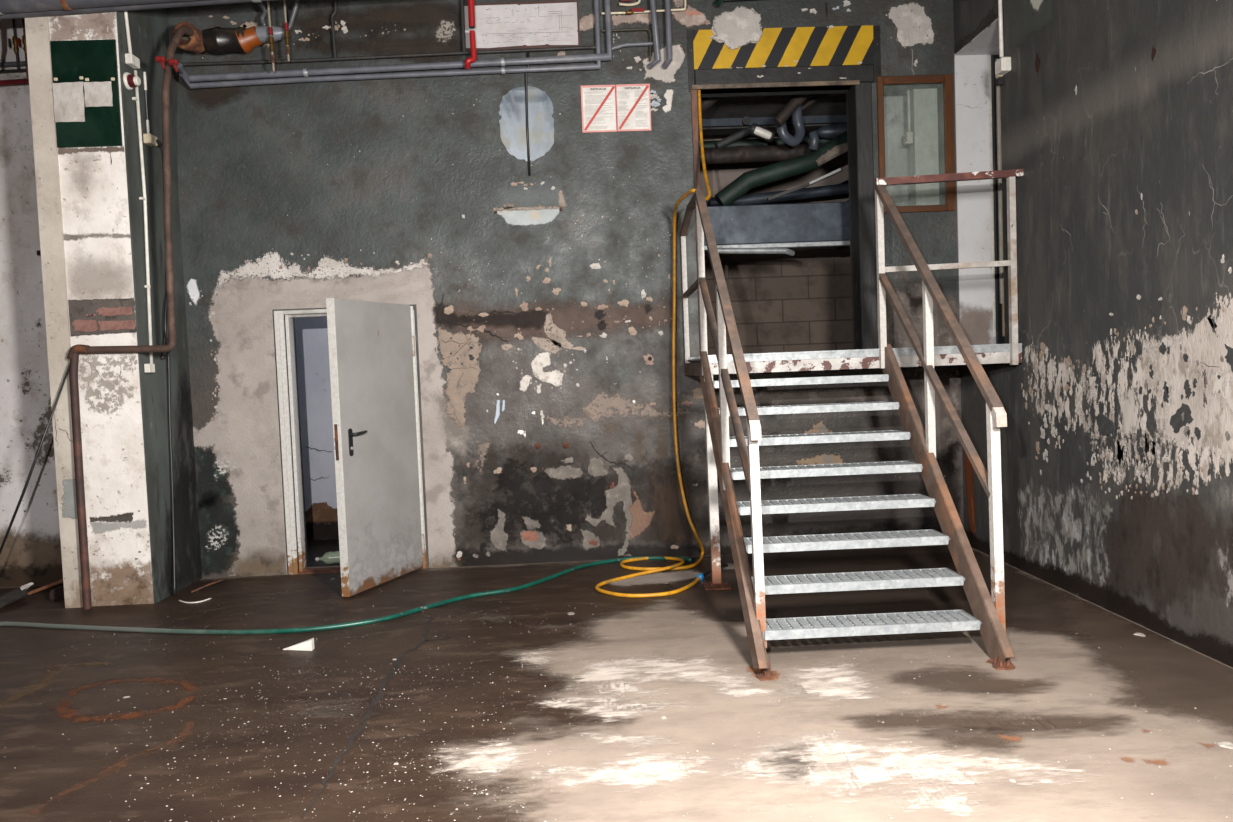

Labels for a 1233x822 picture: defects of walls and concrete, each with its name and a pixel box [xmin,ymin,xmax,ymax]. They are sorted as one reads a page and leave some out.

water stain [877,273,993,348]
flaking render [186,239,672,576]
peeling [532,386,705,429]
spalling [804,420,832,434]
spalling [796,453,846,465]
peeling [1021,293,1233,505]
water stain [0,371,974,822]
water stain [722,481,1233,816]
corrosion [54,678,197,722]